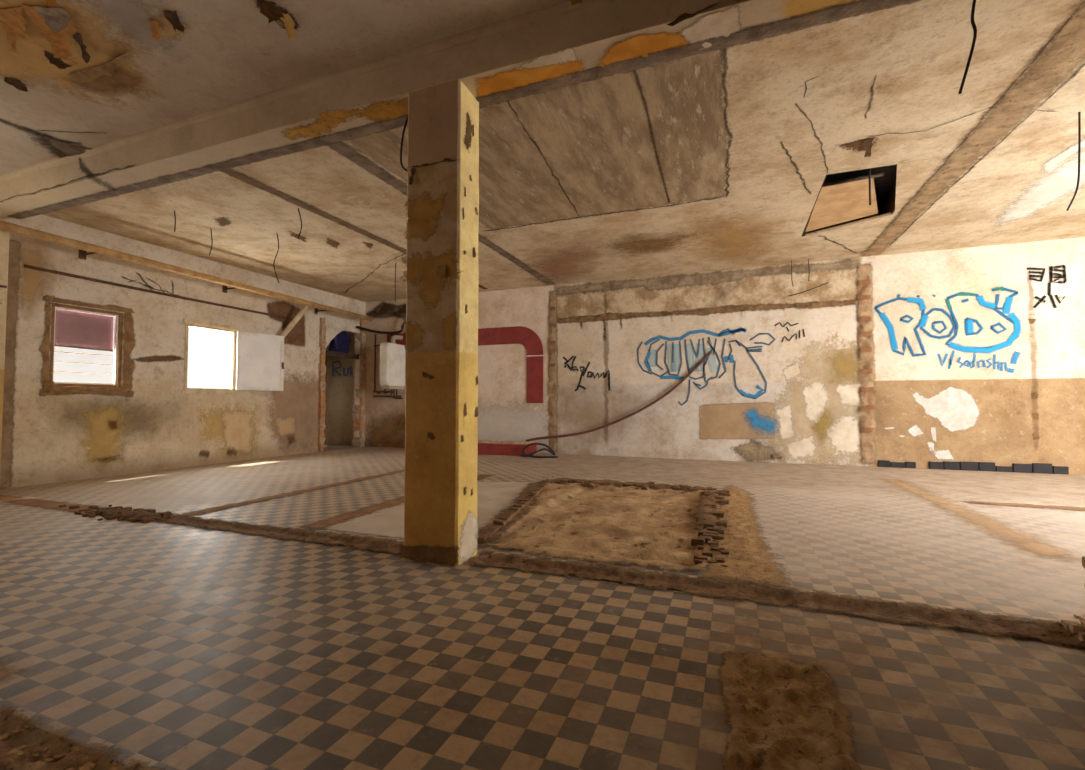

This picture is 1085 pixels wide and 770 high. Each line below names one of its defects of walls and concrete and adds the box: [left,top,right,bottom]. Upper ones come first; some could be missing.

peeling [0,0,154,97]
peeling [0,97,408,219]
peeling [463,0,920,231]
crack [781,76,828,194]
crack [864,75,996,136]
spalling [351,302,424,447]
peeling [400,191,476,350]
spalling [557,258,859,296]
spalling [557,300,859,340]
peeling [732,334,869,465]
crack [813,232,869,253]
peeling [885,387,980,460]